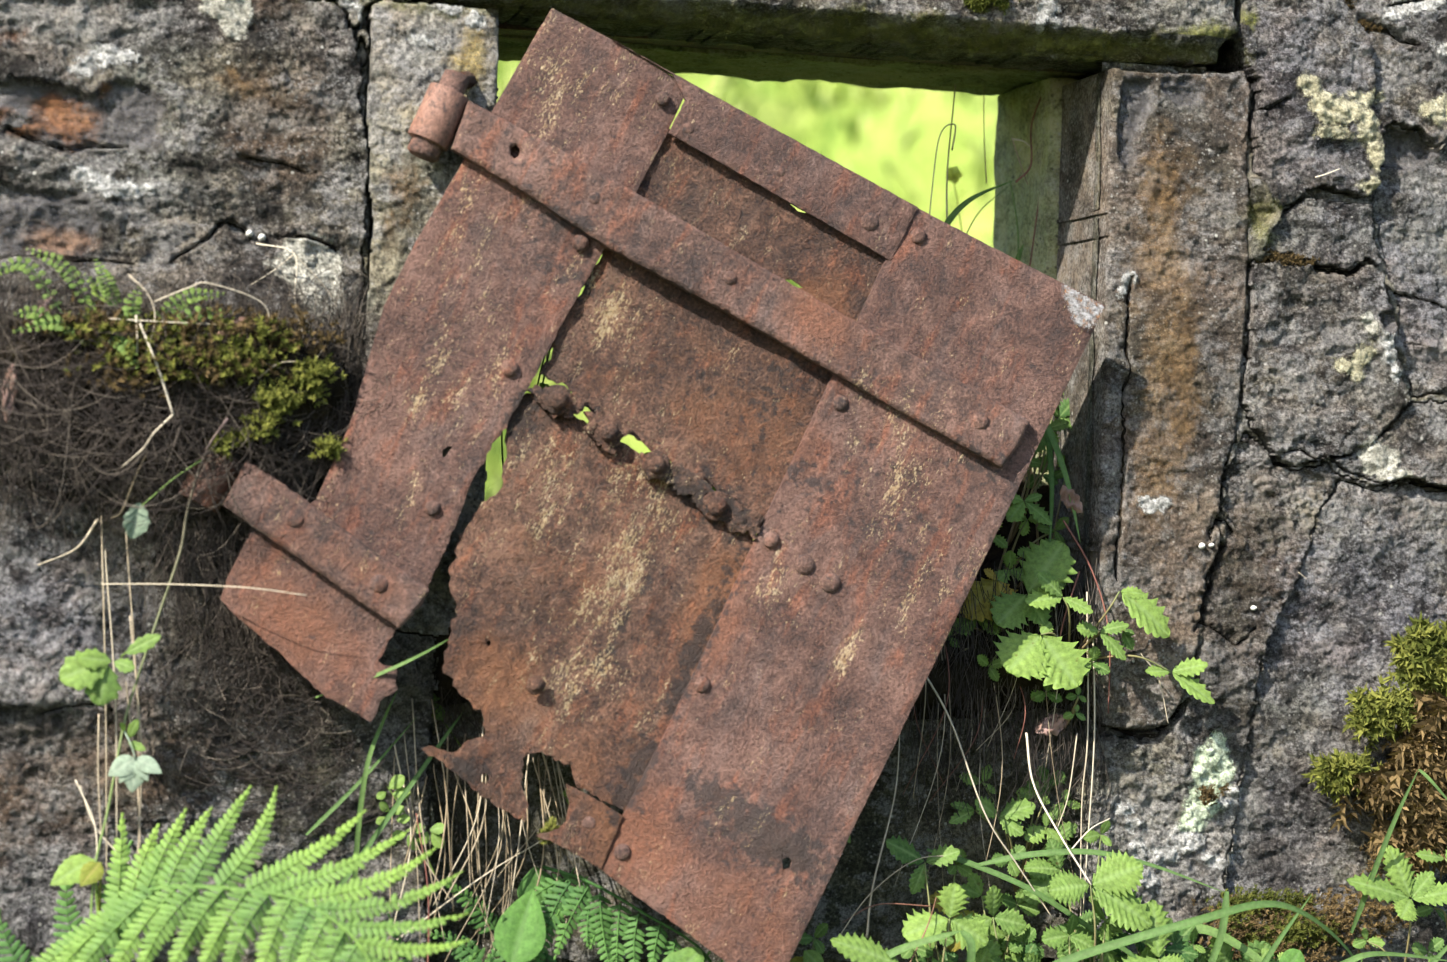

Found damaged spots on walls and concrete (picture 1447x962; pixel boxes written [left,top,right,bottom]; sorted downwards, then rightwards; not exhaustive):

crack [1358,0,1419,46]
corrosion [452,34,482,73]
crack [0,254,134,265]
crack [171,221,336,262]
crack [1313,263,1361,276]
crack [1393,292,1442,307]
crack [1114,279,1131,581]
crack [1283,448,1447,492]
crack [1193,461,1256,646]